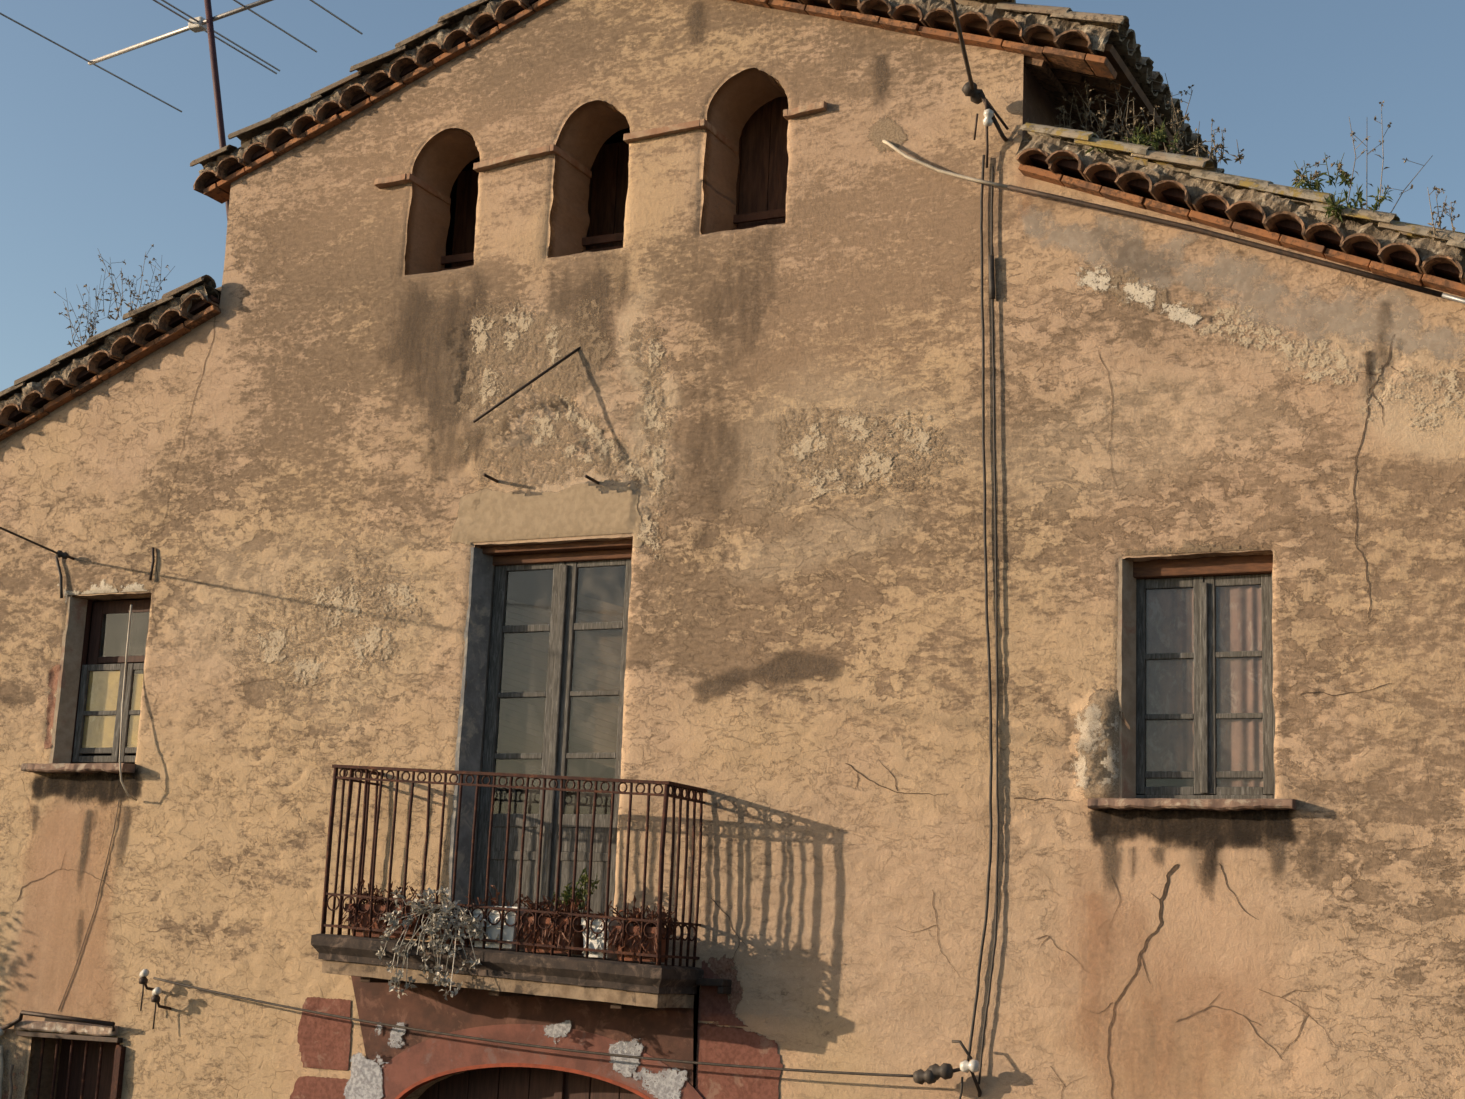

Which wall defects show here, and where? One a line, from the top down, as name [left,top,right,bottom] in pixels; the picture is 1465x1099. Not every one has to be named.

peeling [1075,265,1203,331]
damp [389,281,485,468]
crack [1353,335,1405,620]
damp [1102,836,1133,884]
damp [1199,840,1217,886]
crack [1219,863,1256,919]
damp [1271,840,1284,873]
crack [1037,864,1179,1099]
peeling [543,1020,572,1044]
flaking render [608,955,783,1099]
crack [1176,988,1337,1060]